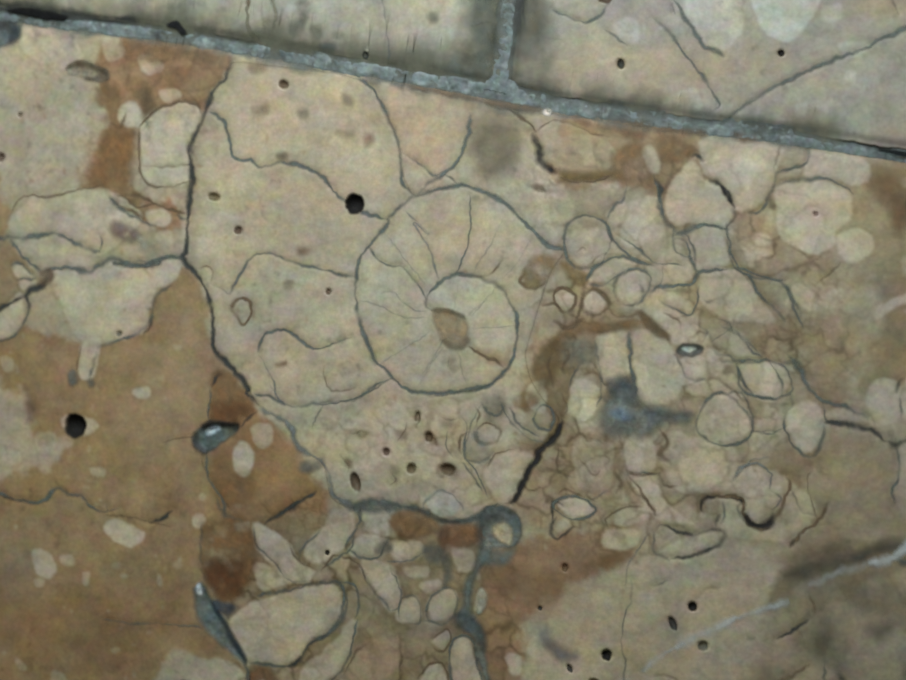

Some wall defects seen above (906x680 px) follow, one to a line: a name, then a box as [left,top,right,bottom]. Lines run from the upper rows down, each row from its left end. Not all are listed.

crack [675,2,738,114]
crack [764,26,906,92]
crack [506,108,608,182]
crack [713,181,732,204]
crack [785,163,850,190]
crack [0,74,325,466]
crack [519,199,801,329]
crack [246,404,562,680]
crack [627,337,637,392]
crack [551,435,715,559]
crack [700,420,802,531]
crack [704,346,899,495]